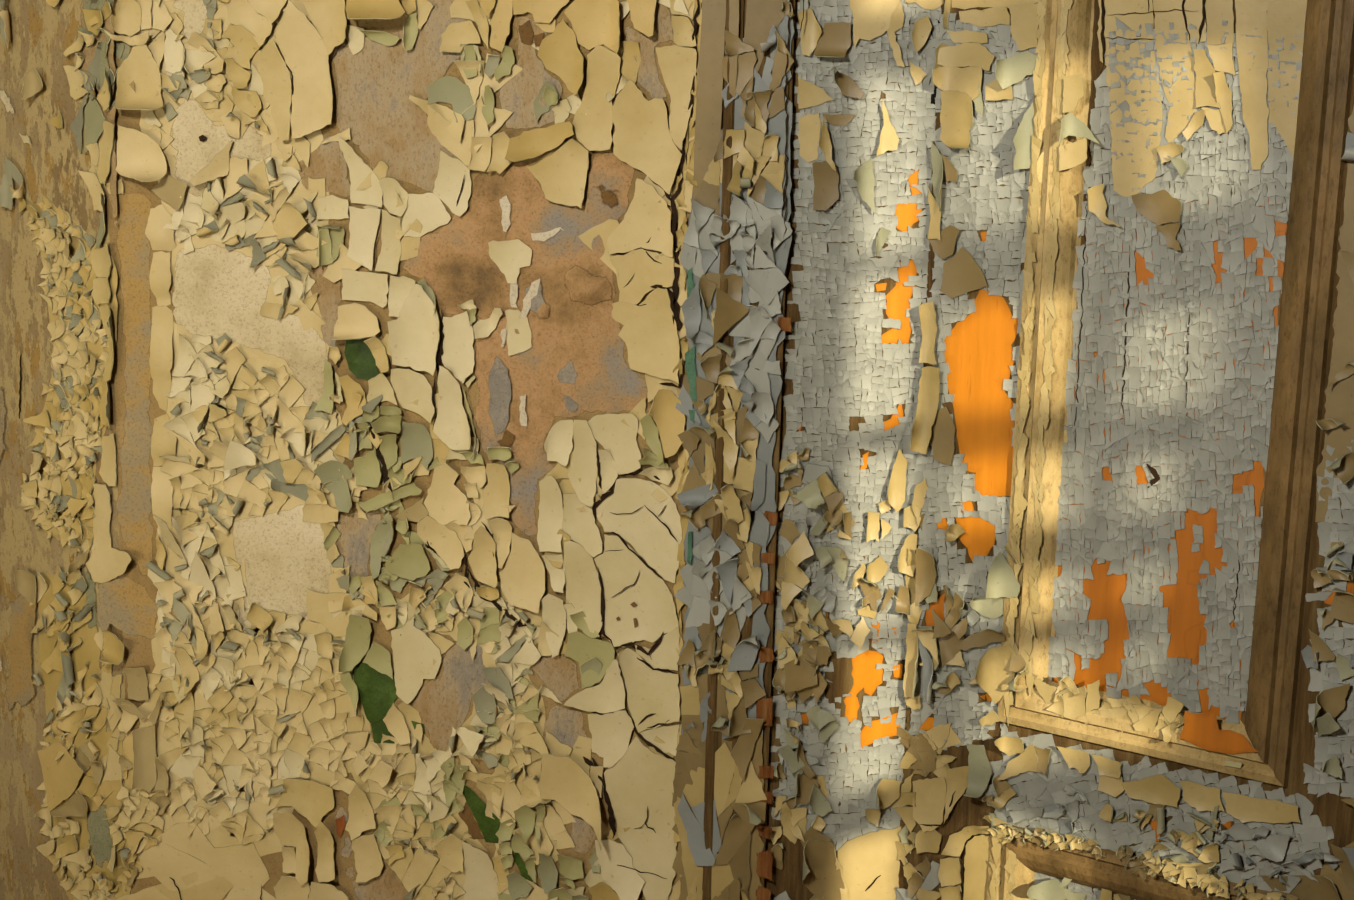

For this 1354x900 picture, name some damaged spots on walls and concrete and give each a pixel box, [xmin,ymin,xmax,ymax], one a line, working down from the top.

peeling [1086,0,1307,251]
flaking render [0,0,907,900]
peeling [875,0,1258,754]
peeling [1258,261,1284,279]
peeling [1315,106,1354,522]
crack [592,709,675,761]
crack [592,451,678,674]
peeling [770,705,1106,900]
peeling [1056,746,1354,900]
peeling [1301,542,1354,736]